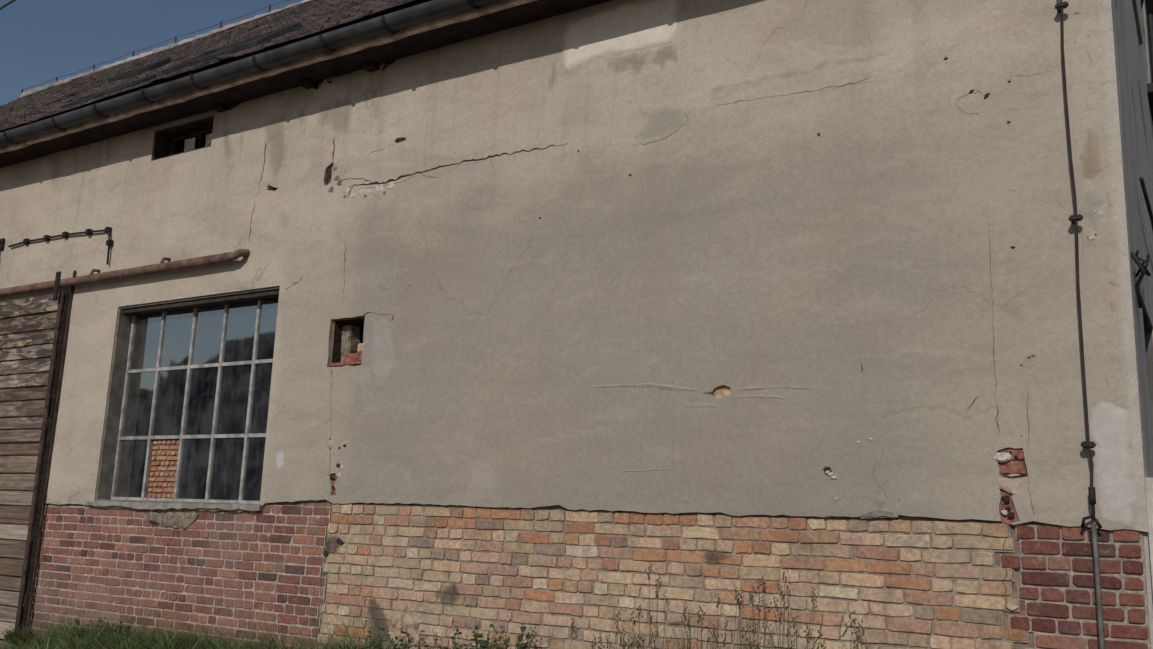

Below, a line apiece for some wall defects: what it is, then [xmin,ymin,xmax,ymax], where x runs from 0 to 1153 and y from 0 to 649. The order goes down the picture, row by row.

crack [332,136,565,196]
crack [968,204,1000,432]
spalling [993,448,1028,526]